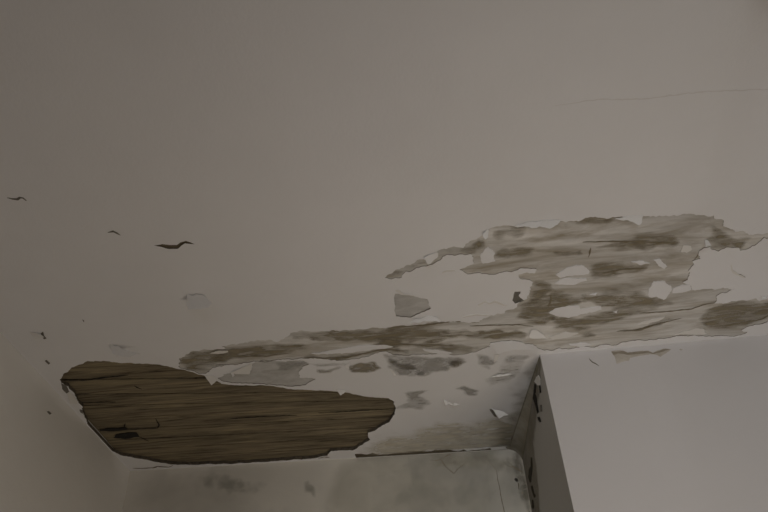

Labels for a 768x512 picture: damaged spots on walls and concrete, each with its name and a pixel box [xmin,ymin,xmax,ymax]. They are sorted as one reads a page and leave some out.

peeling [60,214,768,465]
water stain [394,357,456,375]
crack [355,446,536,512]